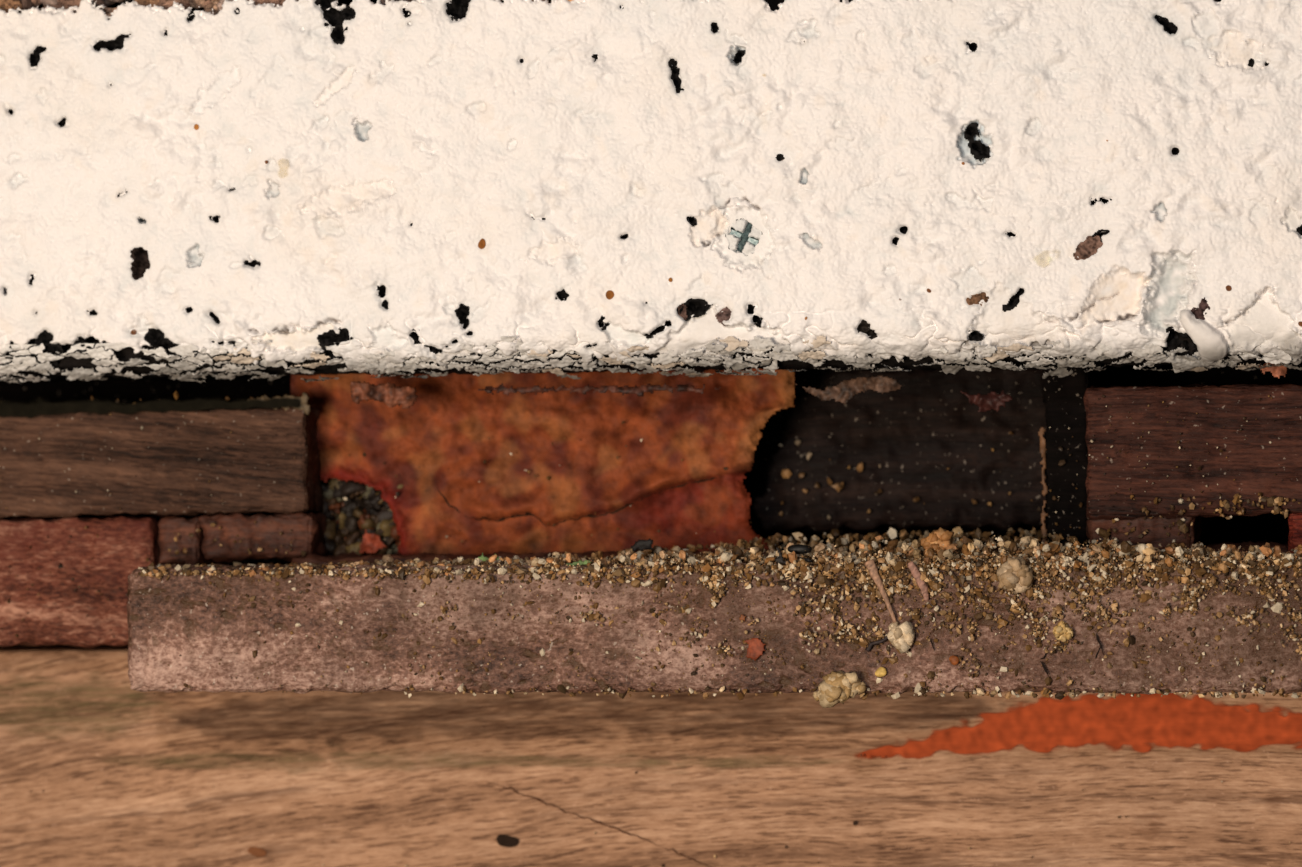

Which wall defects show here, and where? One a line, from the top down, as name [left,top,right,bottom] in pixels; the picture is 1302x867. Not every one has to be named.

crack [437,476,724,526]
peeling [359,529,387,553]
crack [486,781,710,867]